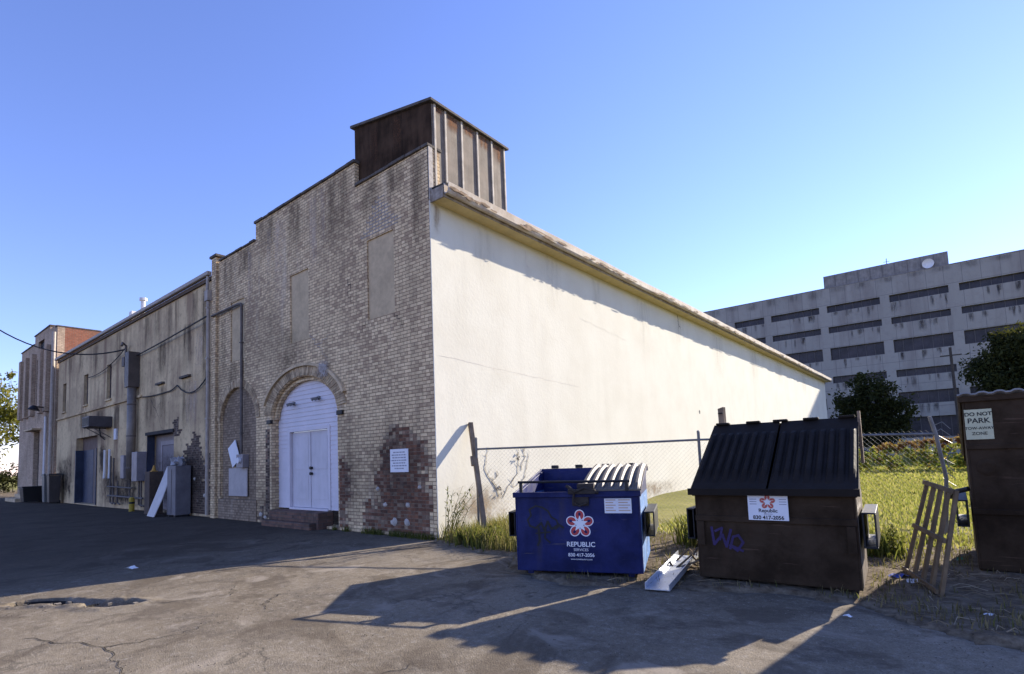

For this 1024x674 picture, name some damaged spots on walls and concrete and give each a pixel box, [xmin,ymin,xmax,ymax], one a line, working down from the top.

spalling [172,417,210,515]
spalling [339,424,434,535]
crack [24,586,284,674]